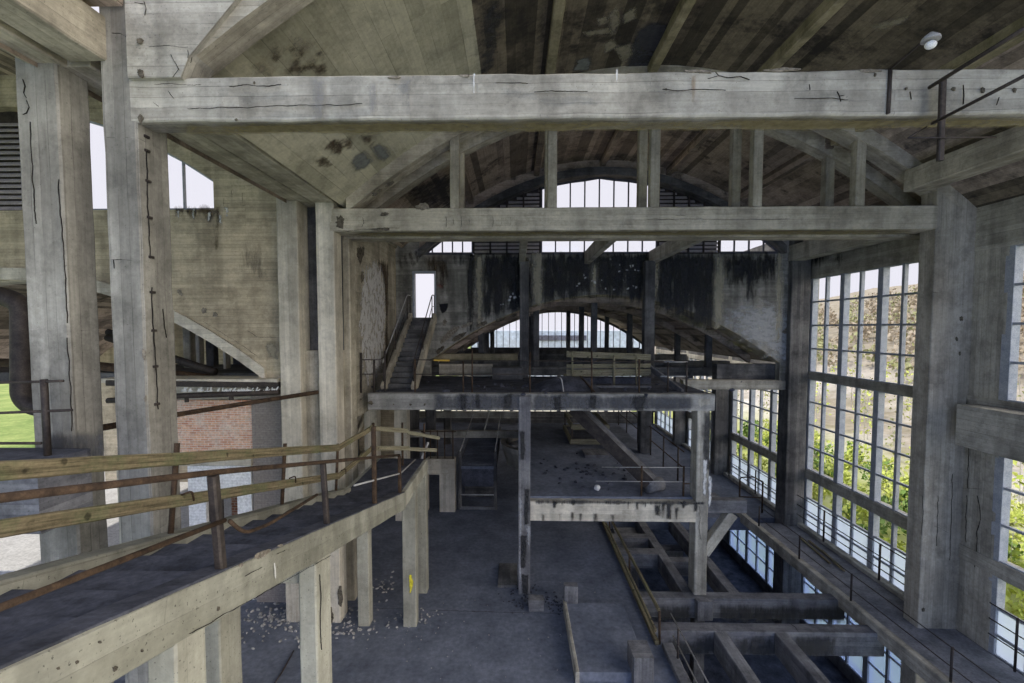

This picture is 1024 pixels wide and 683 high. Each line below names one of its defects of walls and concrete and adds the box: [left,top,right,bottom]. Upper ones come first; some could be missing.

crack [150,45,362,109]
crack [662,72,750,91]
crack [794,84,848,102]
crack [22,79,73,431]
crack [112,152,151,269]
crack [151,287,167,409]
peeling [357,246,386,385]
damp [467,253,787,360]
crack [921,448,981,567]